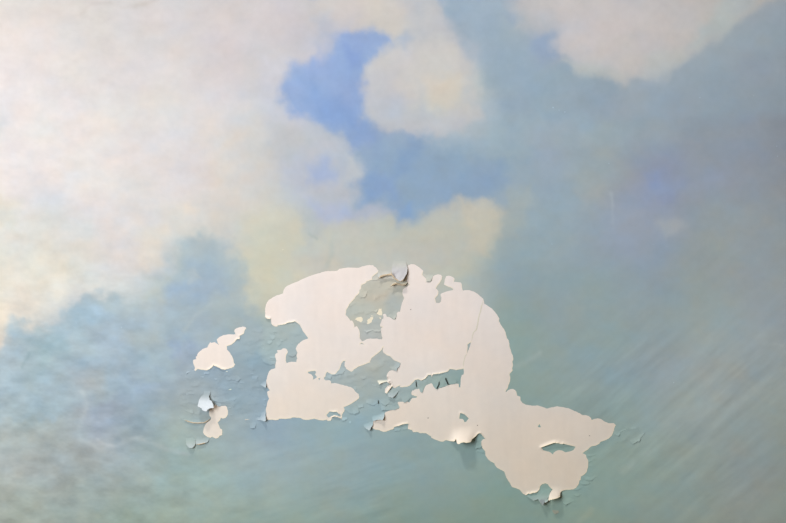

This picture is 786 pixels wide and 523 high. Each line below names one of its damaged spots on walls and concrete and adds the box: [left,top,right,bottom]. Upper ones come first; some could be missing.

peeling [178,261,616,514]